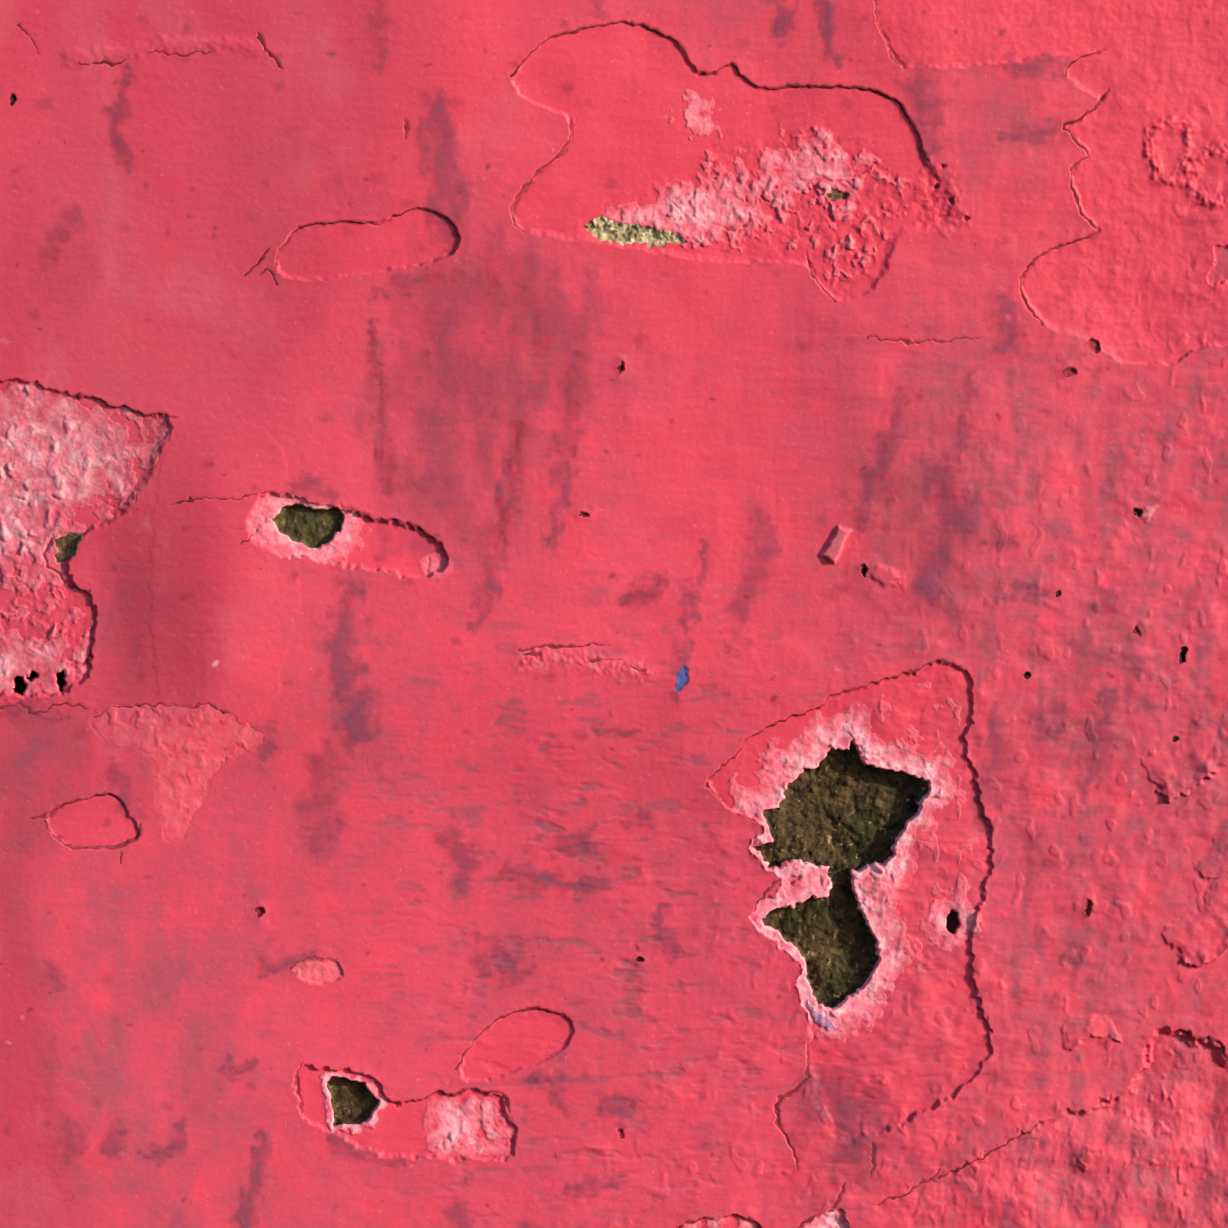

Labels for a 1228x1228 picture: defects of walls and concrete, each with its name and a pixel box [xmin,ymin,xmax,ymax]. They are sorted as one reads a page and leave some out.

peeling [510,20,953,302]
crack [867,335,981,345]
spalling [171,491,454,582]
peeling [0,378,263,842]
spalling [706,659,994,1138]
spalling [293,1006,574,1164]
peeling [676,1214,761,1228]
crack [774,1038,814,1170]
peeling [802,1208,854,1228]
crack [796,1142,940,1228]
spalling [906,1029,1228,1228]